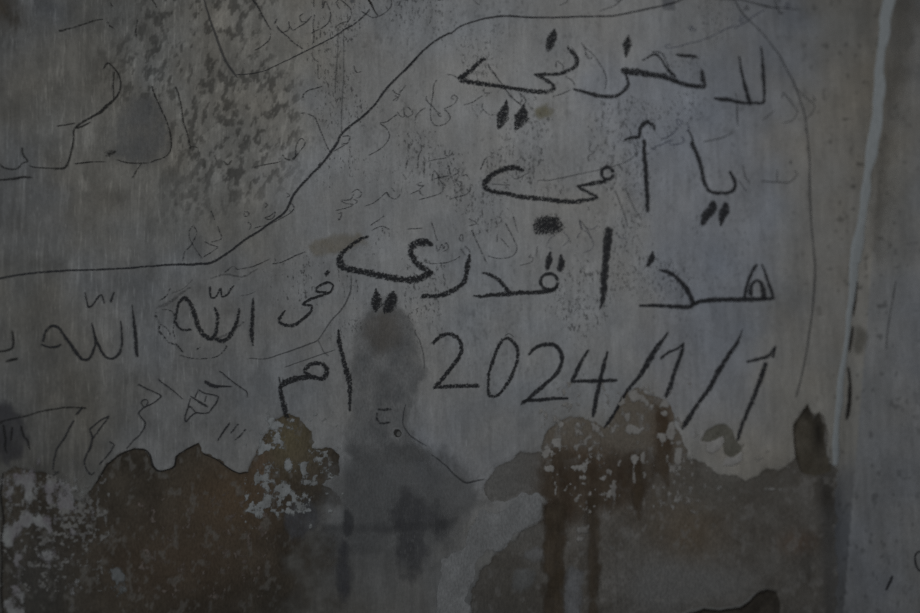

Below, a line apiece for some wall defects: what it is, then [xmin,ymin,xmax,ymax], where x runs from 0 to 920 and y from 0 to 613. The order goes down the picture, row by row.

spalling [0,411,344,613]
water stain [334,304,468,595]
spalling [470,382,838,613]